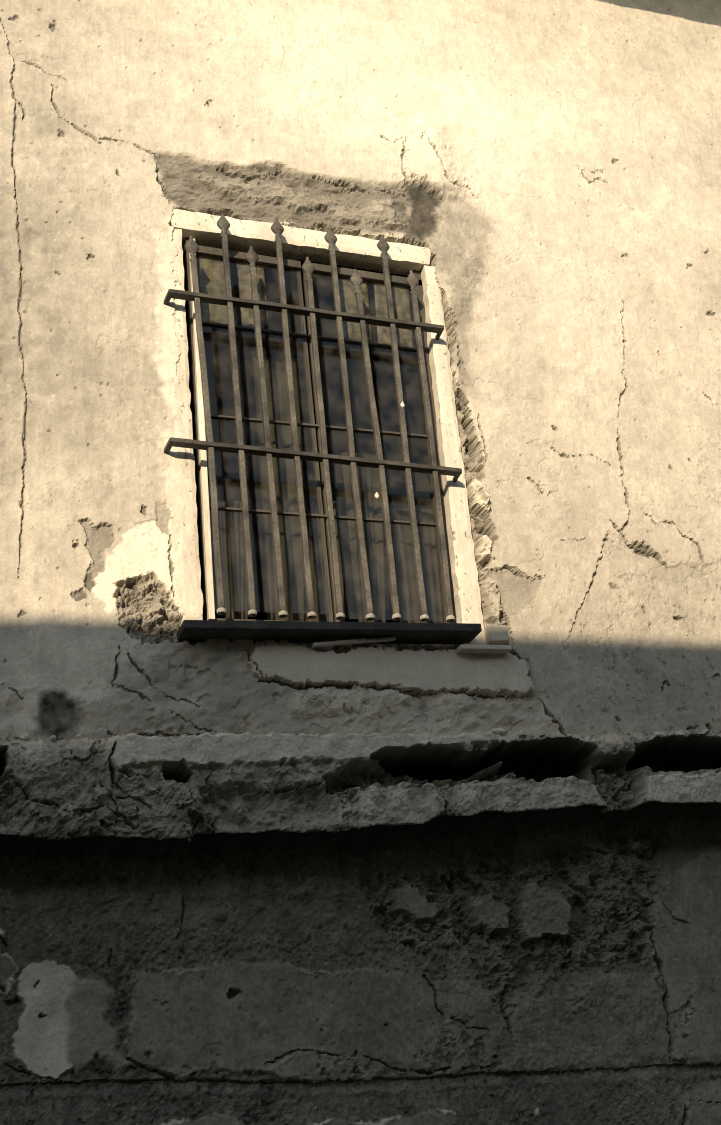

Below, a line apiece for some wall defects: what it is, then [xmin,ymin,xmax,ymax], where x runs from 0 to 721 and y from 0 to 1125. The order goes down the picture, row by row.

crack [215,129,476,198]
crack [0,17,175,584]
flaking render [156,153,553,734]
crack [548,298,704,637]
peeling [71,502,181,611]
crack [167,534,176,599]
spalling [0,747,9,777]
spalling [161,760,192,783]
spalling [188,722,721,842]
peeling [0,851,721,1080]
crack [633,899,693,1063]
crack [263,1047,453,1081]